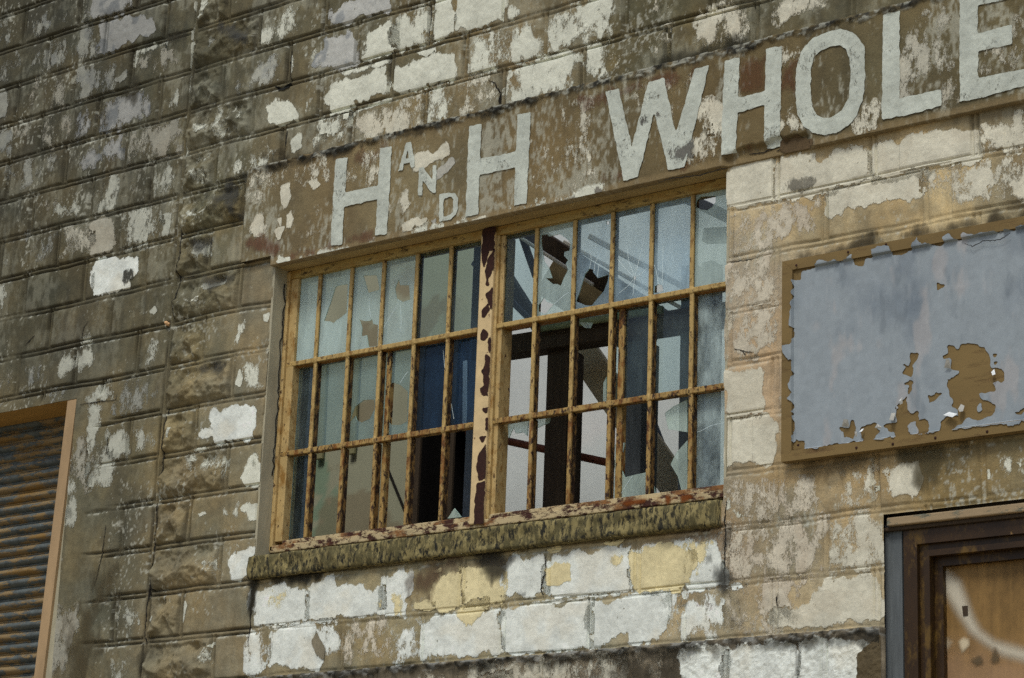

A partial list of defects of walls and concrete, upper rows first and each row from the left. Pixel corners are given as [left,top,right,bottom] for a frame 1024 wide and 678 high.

peeling [0,0,618,296]
crack [144,503,158,645]
crack [158,409,170,476]
peeling [185,404,261,488]
rust [474,226,496,525]
peeling [243,95,1024,678]